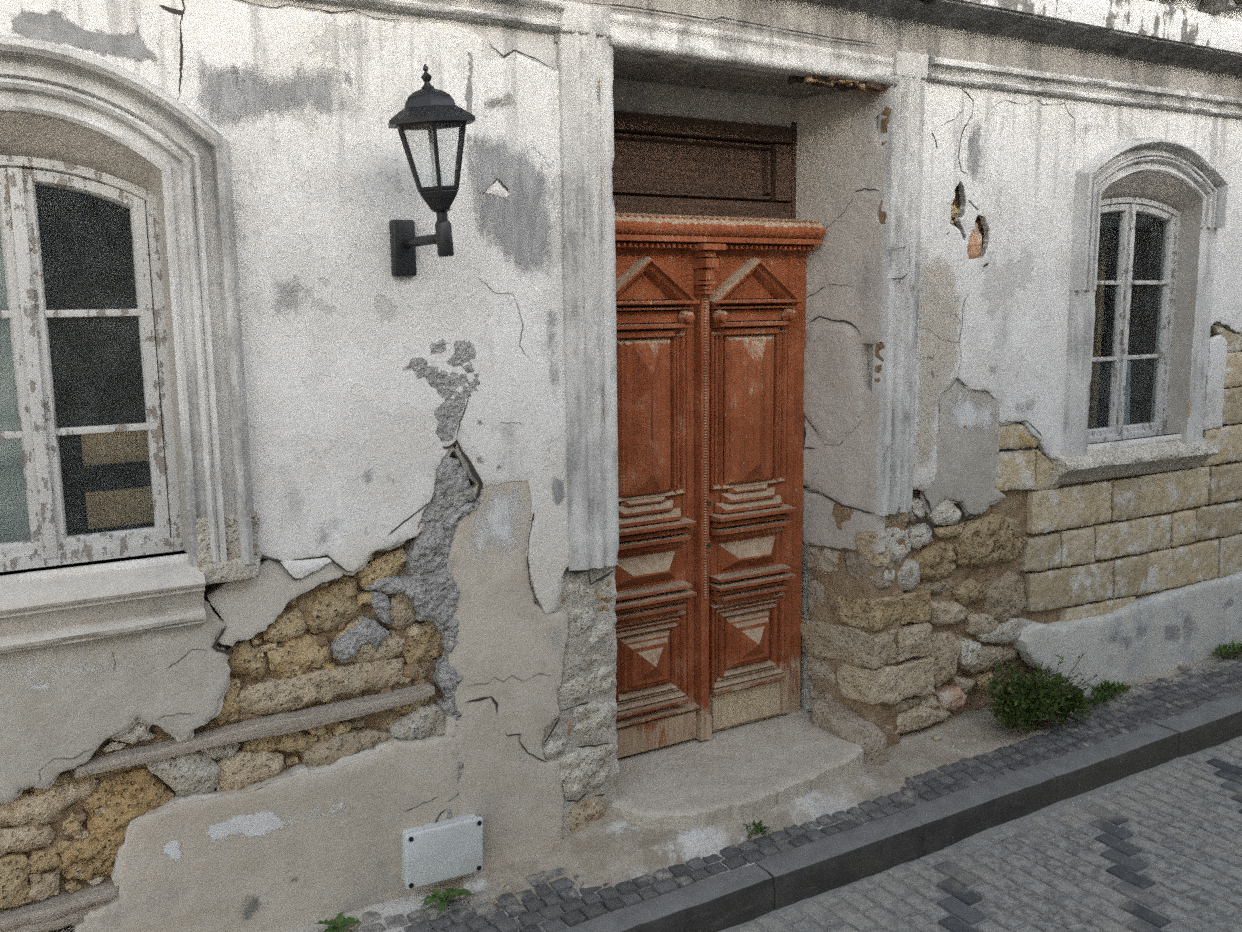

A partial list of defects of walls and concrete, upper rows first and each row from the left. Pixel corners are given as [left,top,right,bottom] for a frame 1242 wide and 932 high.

crack [239,0,410,22]
crack [160,0,185,105]
crack [489,40,556,70]
water stain [199,64,342,124]
spalling [950,205,960,225]
spalling [967,222,982,259]
crack [481,280,530,359]
spalling [800,325,1242,735]
spalling [0,547,446,909]
crack [463,673,611,762]
crack [566,791,605,802]